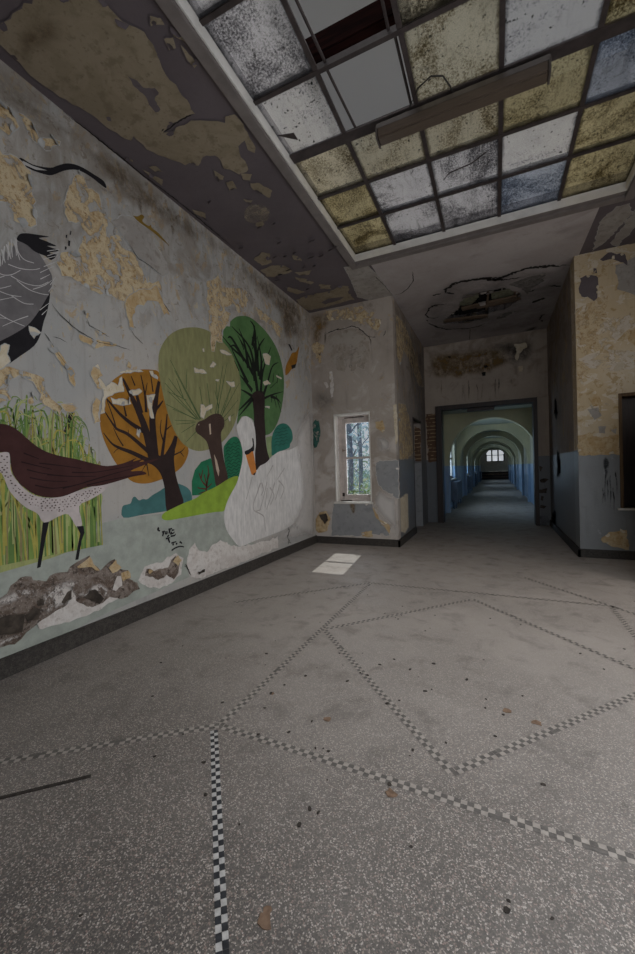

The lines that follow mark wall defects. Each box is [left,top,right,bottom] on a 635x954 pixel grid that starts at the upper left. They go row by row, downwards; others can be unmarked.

peeling [0,0,273,205]
peeling [0,149,38,228]
peeling [56,170,170,330]
crack [425,264,562,339]
peeling [574,232,635,384]
peeling [577,391,620,456]
flaking render [0,553,183,648]